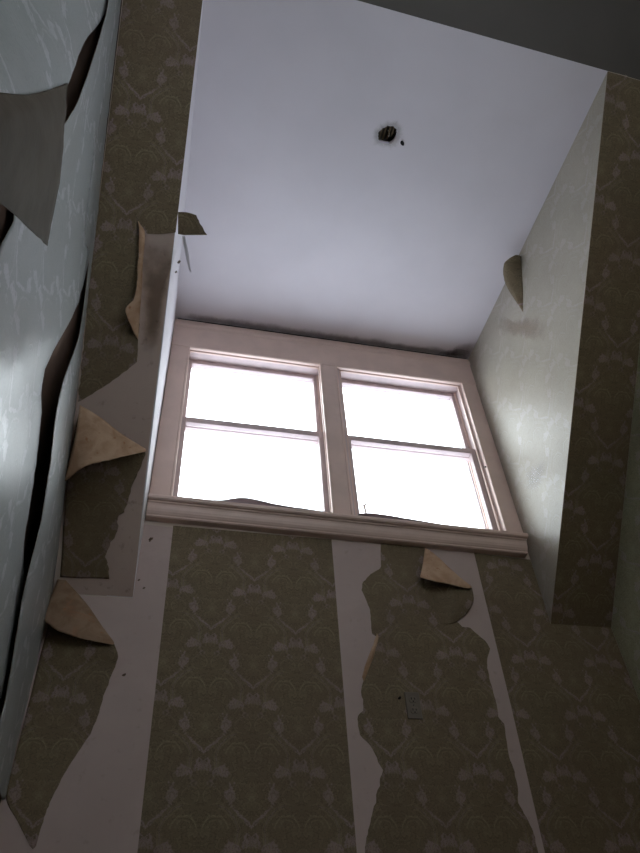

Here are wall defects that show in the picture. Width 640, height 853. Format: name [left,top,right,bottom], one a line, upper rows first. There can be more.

flaking render [0,230,181,853]
flaking render [332,541,383,853]
flaking render [429,549,545,853]